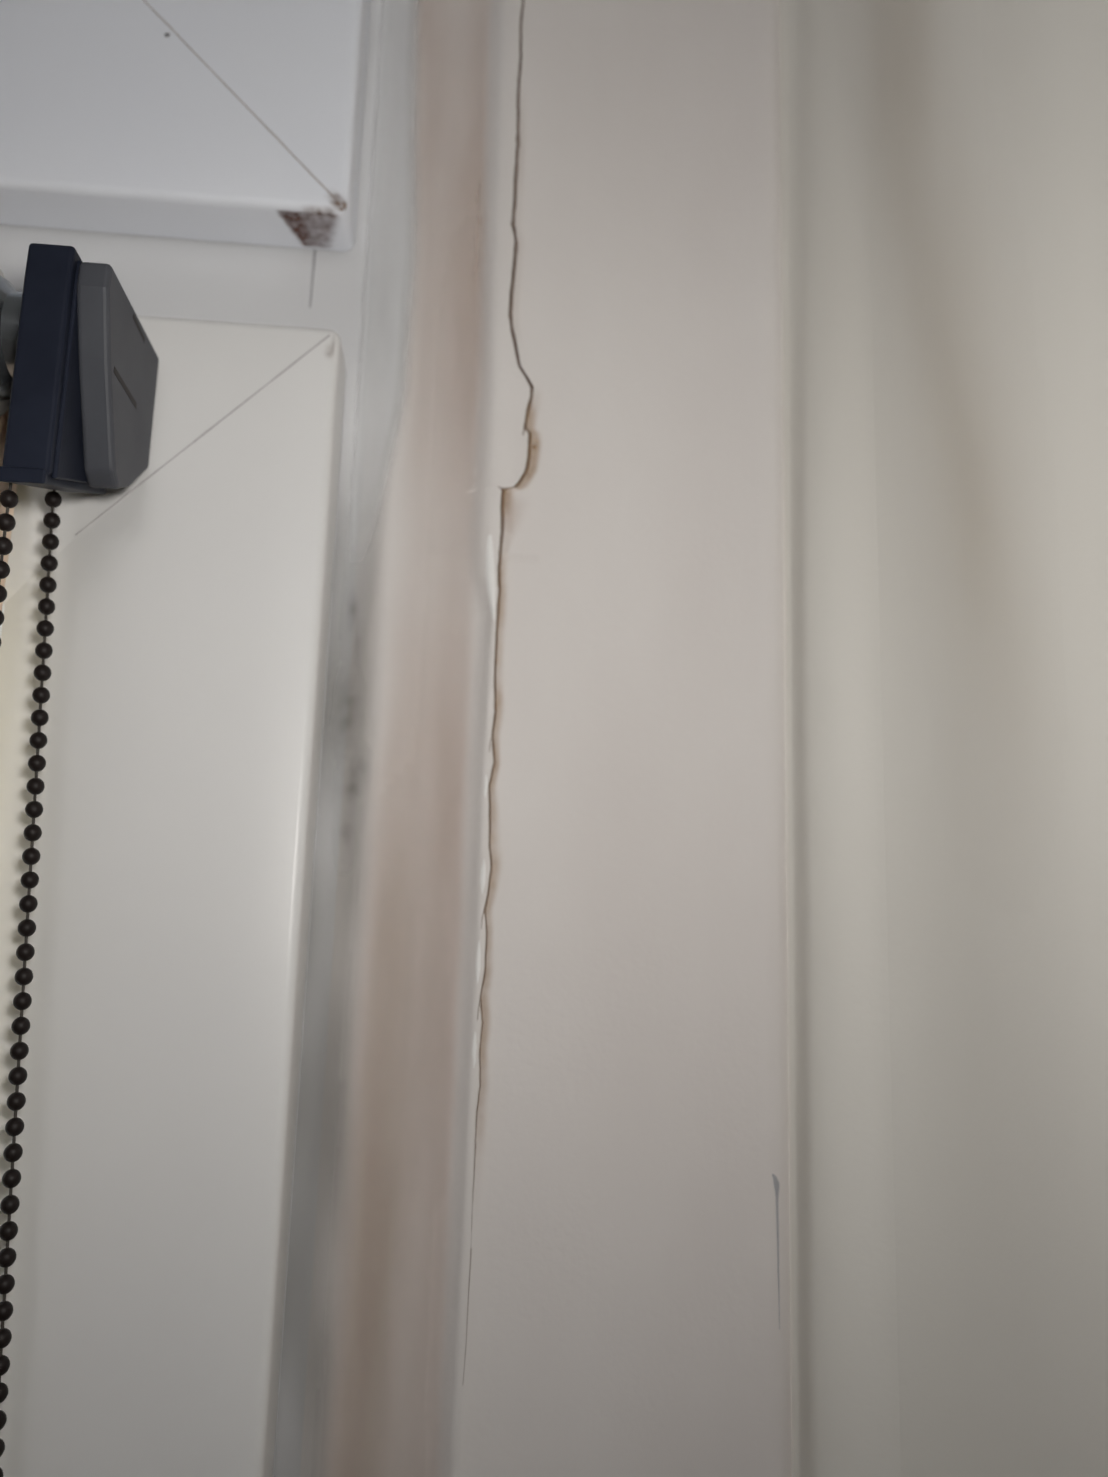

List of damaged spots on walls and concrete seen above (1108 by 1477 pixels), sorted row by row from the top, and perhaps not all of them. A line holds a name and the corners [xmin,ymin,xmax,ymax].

crack [463,0,534,1381]